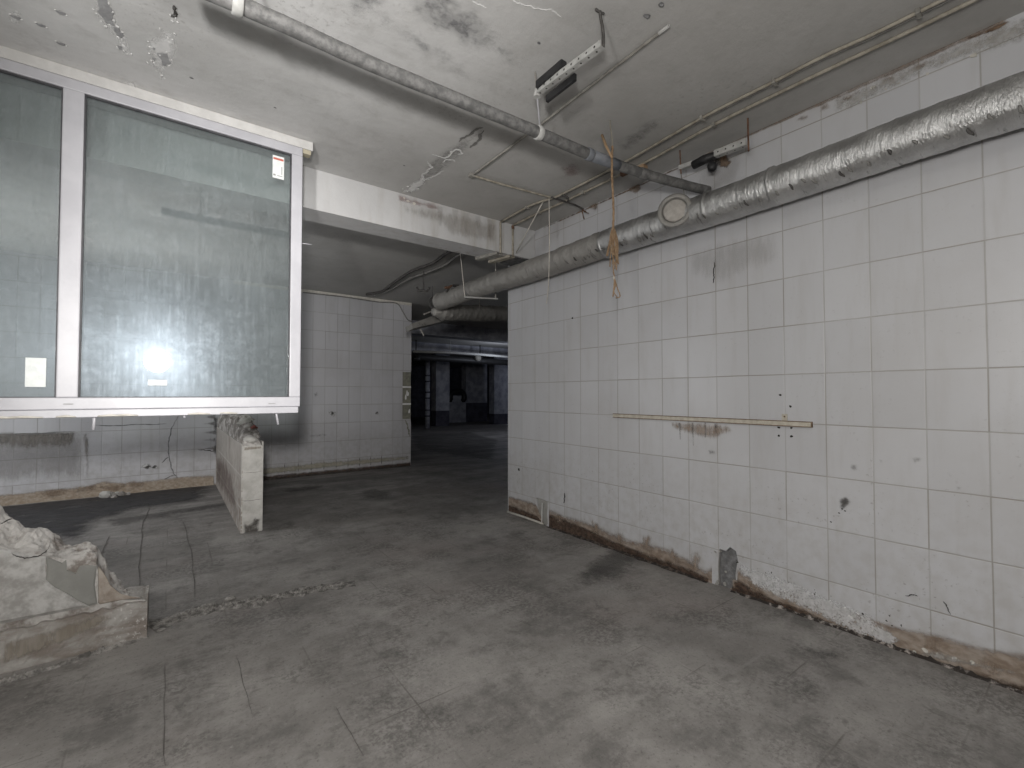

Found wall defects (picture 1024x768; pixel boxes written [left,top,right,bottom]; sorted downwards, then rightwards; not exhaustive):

peeling [92,0,132,55]
peeling [146,5,179,80]
crack [513,0,562,17]
crack [402,127,484,192]
damp [0,431,75,448]
crack [99,415,179,479]
spalling [46,557,140,606]
peeling [714,548,902,644]